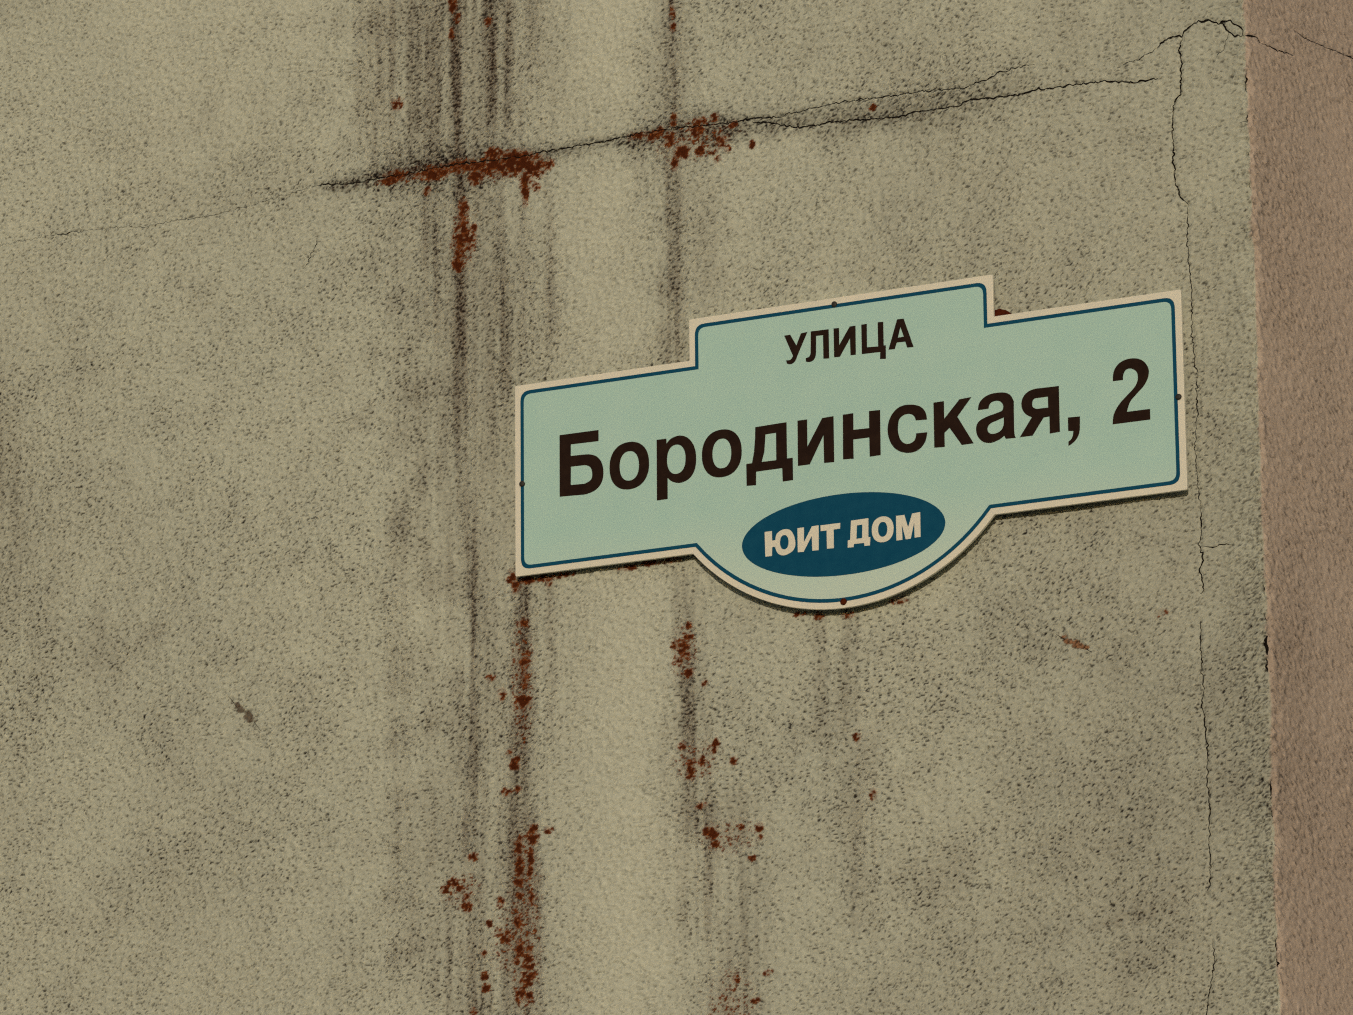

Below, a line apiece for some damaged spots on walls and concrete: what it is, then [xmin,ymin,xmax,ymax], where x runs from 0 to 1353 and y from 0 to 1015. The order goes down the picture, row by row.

water stain [326,0,590,220]
rust [377,146,554,273]
rust [631,112,738,170]
water stain [607,73,942,153]
water stain [453,248,466,442]
crack [17,19,1353,594]
rust [485,620,533,770]
rust [481,824,554,1013]
water stain [508,576,531,957]
rust [702,823,763,862]
crack [1199,621,1212,890]
crack [1206,949,1215,1015]